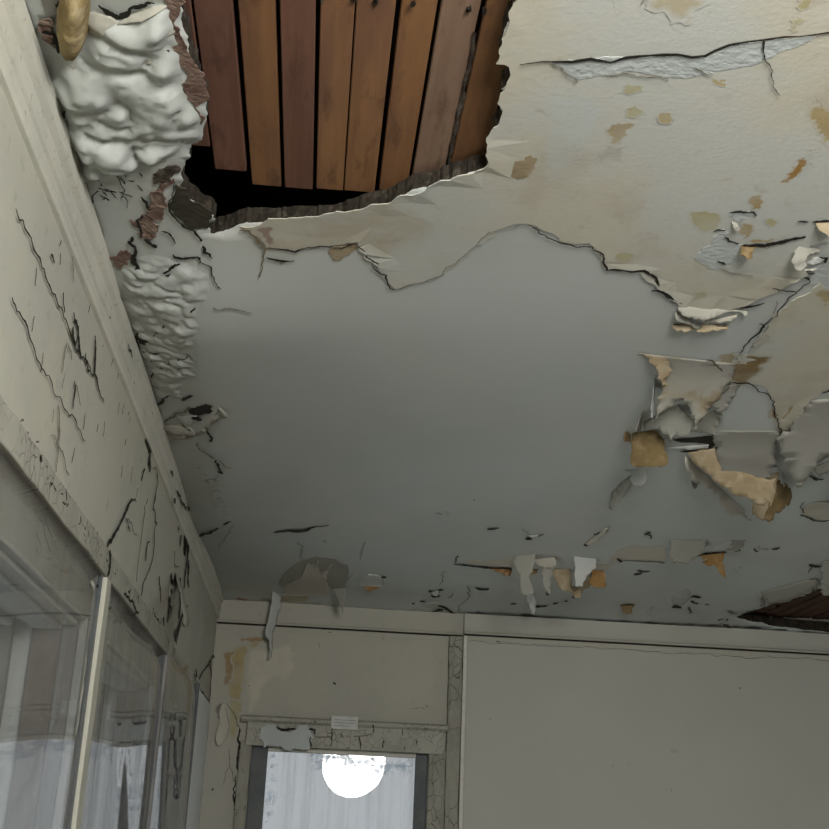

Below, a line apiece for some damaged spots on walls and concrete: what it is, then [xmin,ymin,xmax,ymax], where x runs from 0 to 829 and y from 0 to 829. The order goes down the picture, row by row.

flaking render [150,0,209,124]
crack [520,32,829,93]
damp [645,0,710,25]
crack [161,183,251,313]
crack [266,224,682,304]
crack [12,209,129,475]
crack [107,439,188,644]
crack [196,431,232,548]